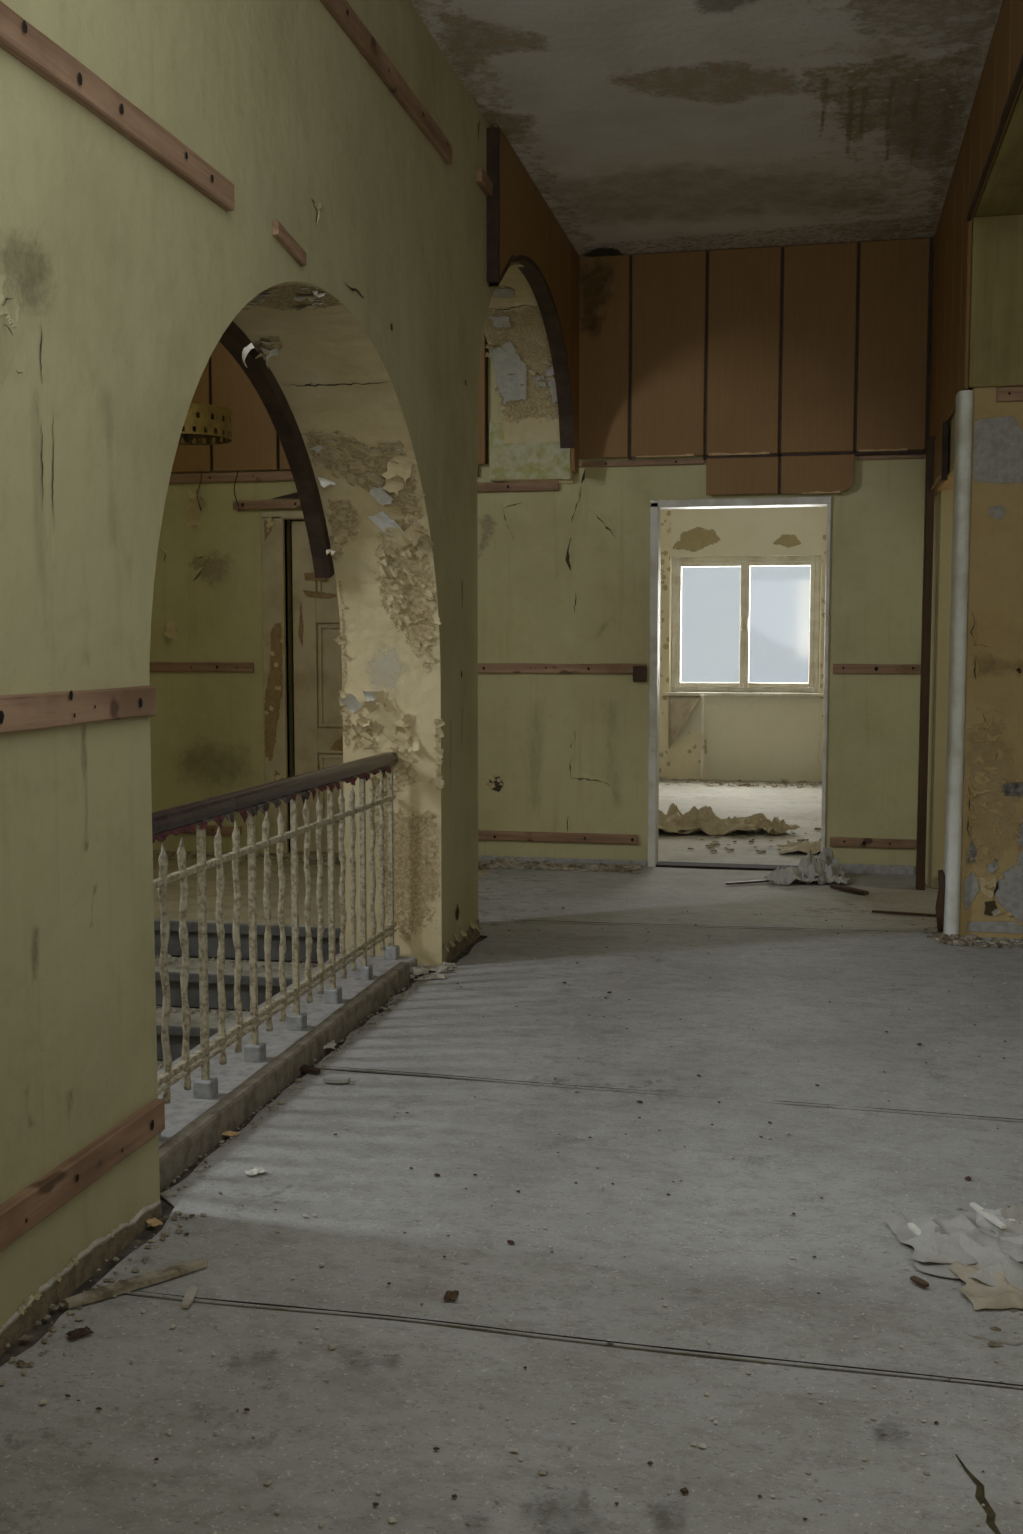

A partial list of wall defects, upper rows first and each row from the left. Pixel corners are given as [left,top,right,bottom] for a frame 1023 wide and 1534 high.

flaking render [485,312,570,479]
flaking render [973,416,1023,484]
peeling [303,430,441,672]
crack [565,470,585,613]
peeling [152,573,445,940]
peeling [962,687,1023,934]
crack [955,1454,1001,1534]